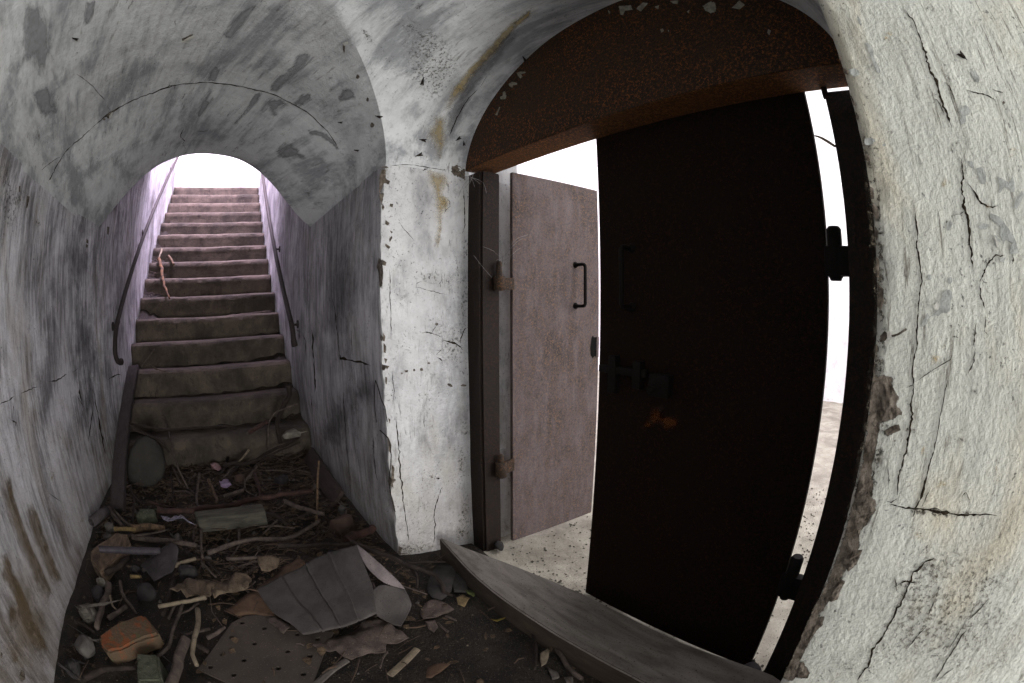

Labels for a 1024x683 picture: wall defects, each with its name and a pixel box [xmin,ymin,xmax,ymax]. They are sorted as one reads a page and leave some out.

damp [452,12,530,97]
crack [906,11,1005,127]
damp [433,176,446,210]
crack [872,158,1014,516]
crack [303,299,409,540]
spalling [783,328,907,681]
crack [858,558,939,679]